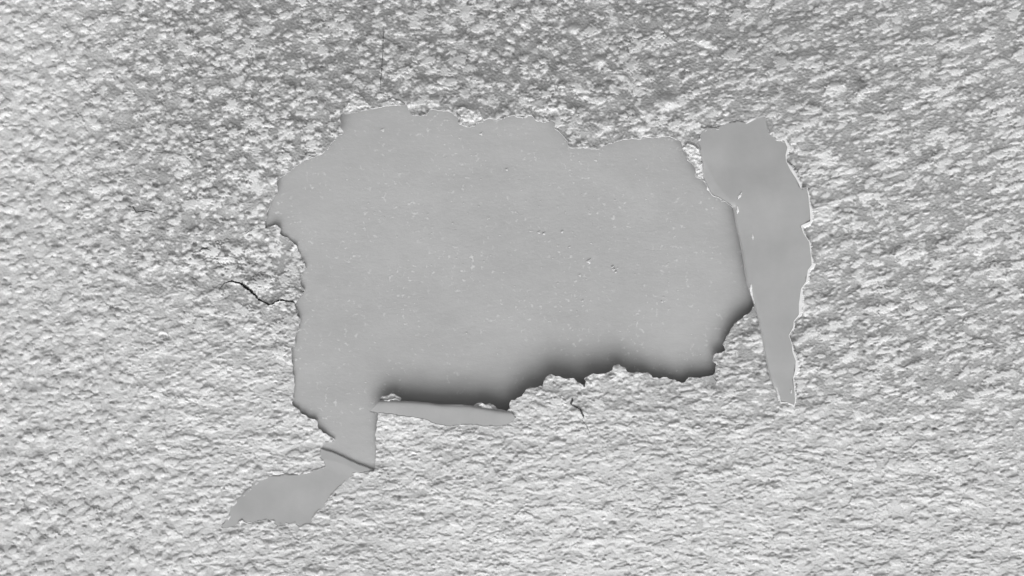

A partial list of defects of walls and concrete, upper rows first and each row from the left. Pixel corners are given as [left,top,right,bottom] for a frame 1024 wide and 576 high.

crack [190,271,295,305]
peeling [221,96,816,528]